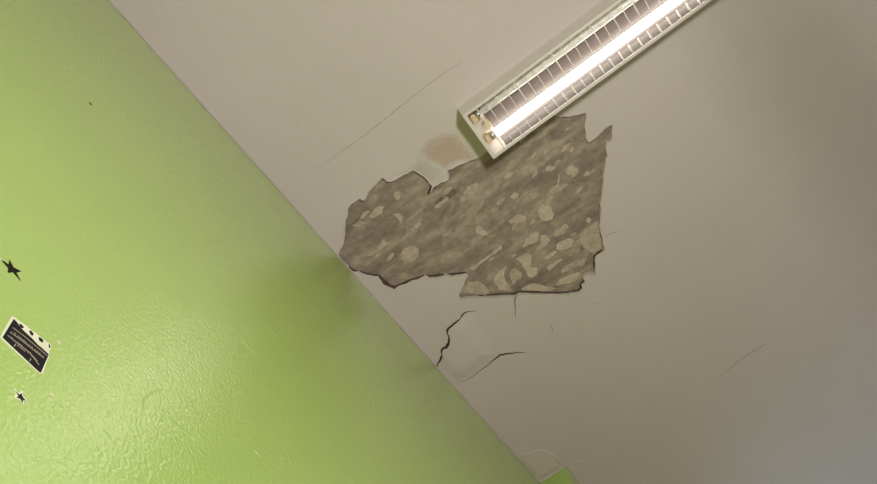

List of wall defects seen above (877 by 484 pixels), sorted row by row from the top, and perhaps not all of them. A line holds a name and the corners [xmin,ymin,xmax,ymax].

peeling [338,113,614,300]
crack [437,311,474,367]
crack [459,352,525,383]